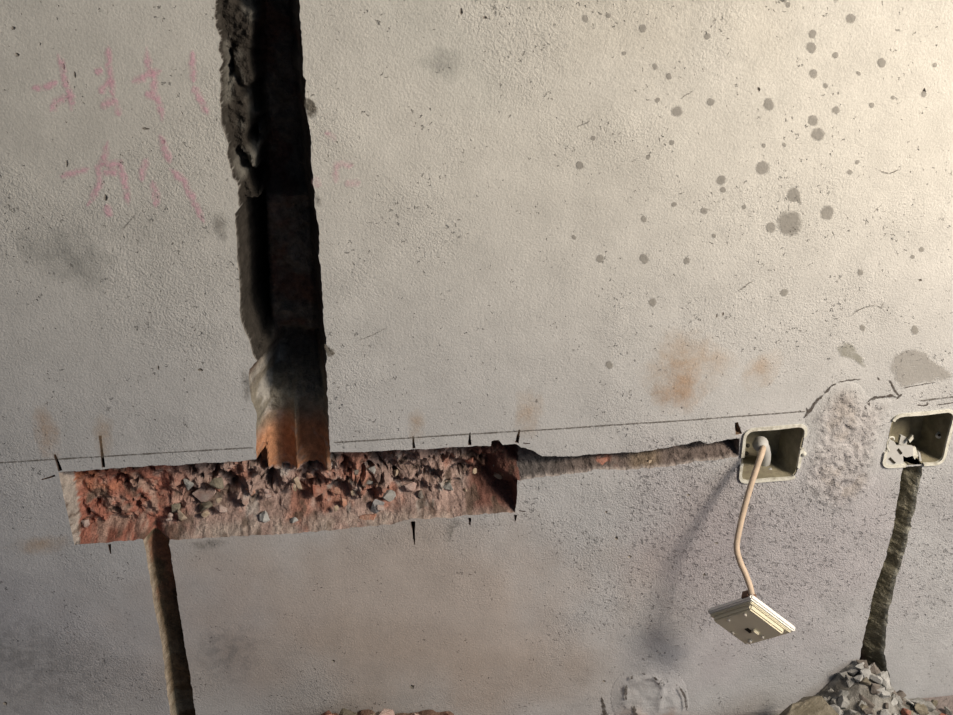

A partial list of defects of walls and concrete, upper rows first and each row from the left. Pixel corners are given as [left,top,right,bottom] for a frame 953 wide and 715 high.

spalling [305,99,317,116]
crack [335,378,953,443]
crack [0,447,253,463]
spalling [166,503,187,522]
spalling [183,477,227,517]
spalling [291,473,356,512]
spalling [370,482,423,514]